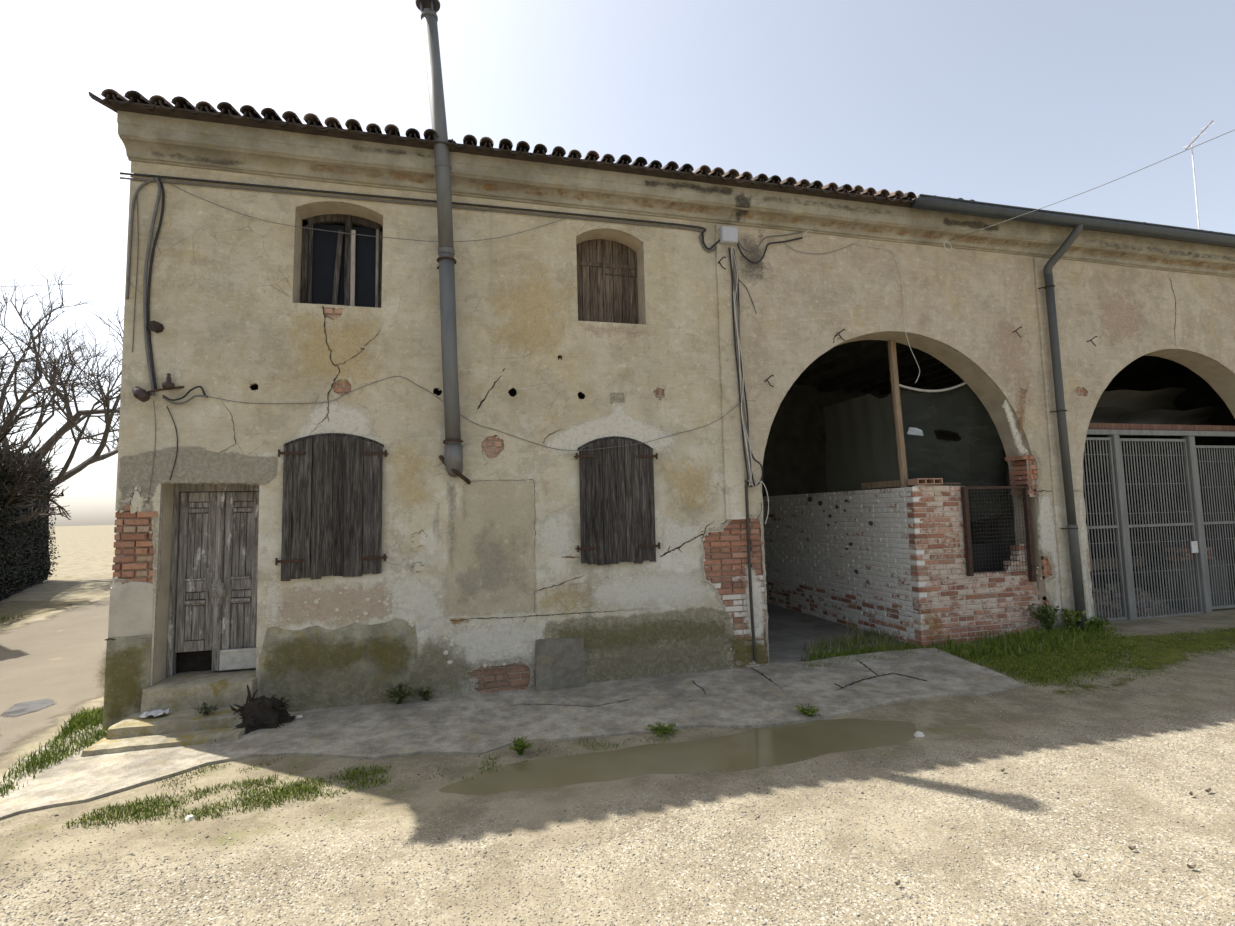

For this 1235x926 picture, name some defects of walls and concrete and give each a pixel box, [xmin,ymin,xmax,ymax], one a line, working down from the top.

crack [309,306,380,436]
flaking render [481,435,504,458]
flaking render [112,486,163,592]
peeling [385,572,443,629]
flaking render [700,514,769,669]
water stain [275,670,428,712]
peeling [443,621,535,694]